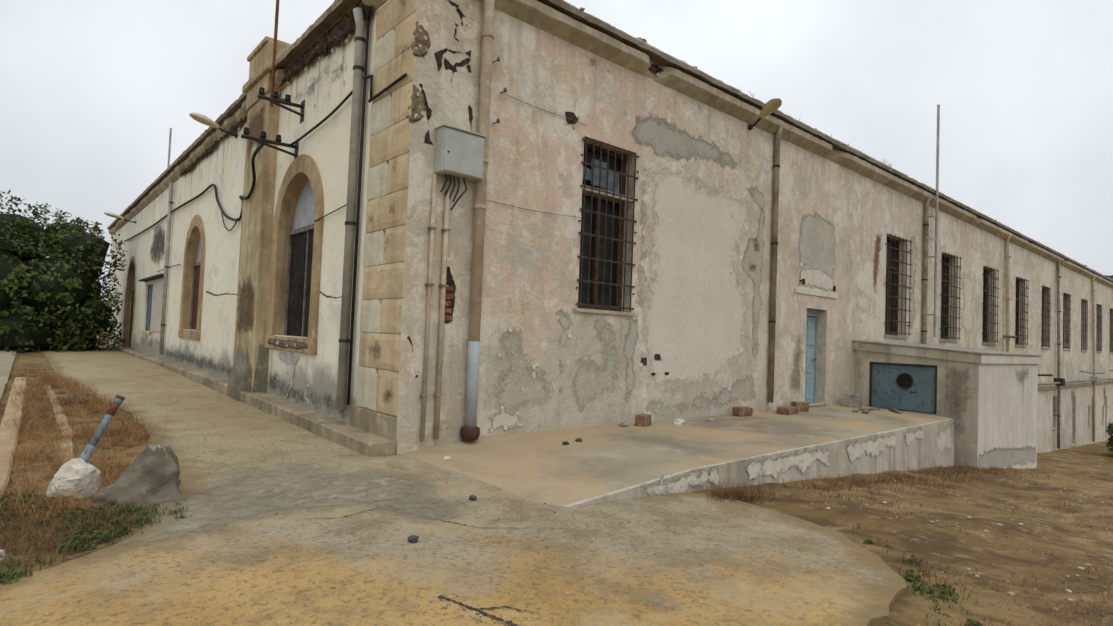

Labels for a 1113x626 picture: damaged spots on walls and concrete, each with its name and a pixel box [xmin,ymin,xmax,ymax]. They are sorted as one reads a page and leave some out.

spalling [402,21,431,59]
spalling [406,85,426,123]
water stain [151,225,166,261]
peeling [559,112,765,411]
peeling [799,212,836,292]
water stain [237,278,254,331]
water stain [167,350,231,375]
peeling [488,406,523,432]
peeling [640,467,721,497]